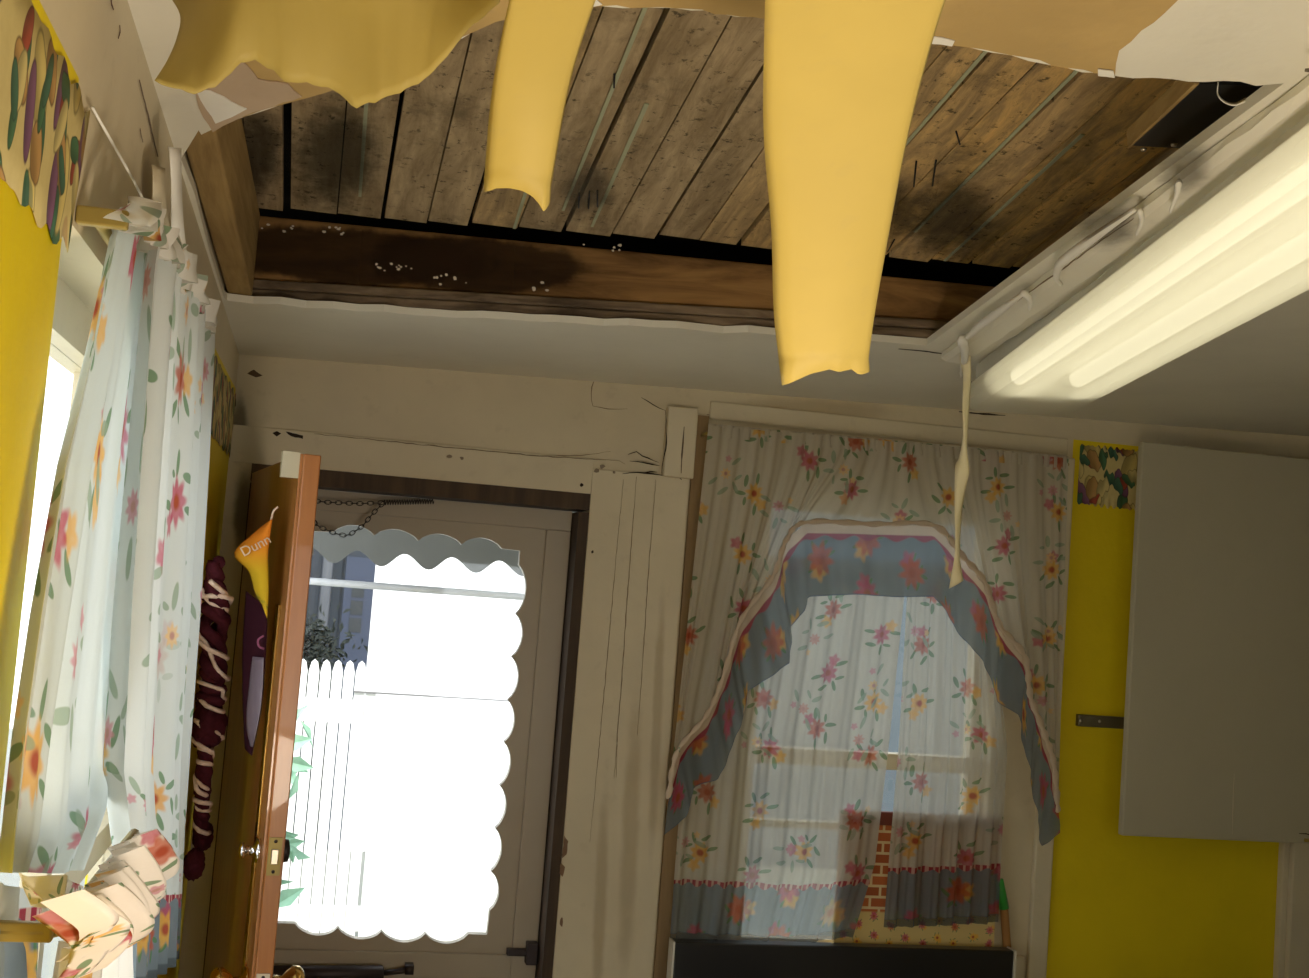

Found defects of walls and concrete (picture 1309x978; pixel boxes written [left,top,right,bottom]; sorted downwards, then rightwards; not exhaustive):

peeling [155,0,509,132]
peeling [598,0,765,19]
peeling [934,0,1178,75]
peeling [1217,82,1246,106]
peeling [151,147,187,250]
water stain [254,226,583,293]
water stain [890,185,987,248]
peeling [1053,207,1137,286]
spalling [251,273,775,328]
spalling [872,326,937,339]